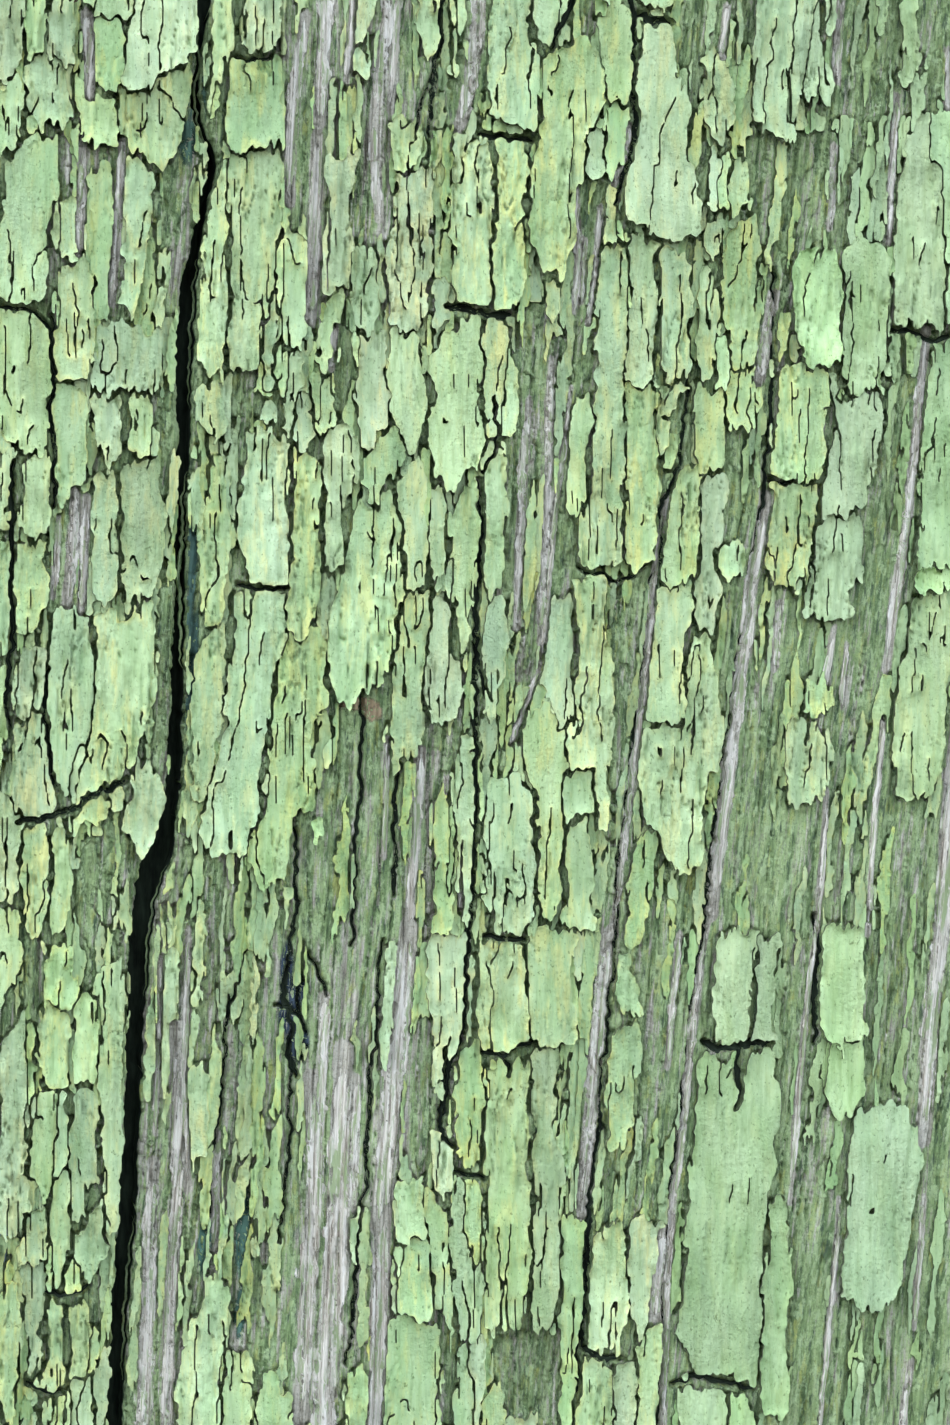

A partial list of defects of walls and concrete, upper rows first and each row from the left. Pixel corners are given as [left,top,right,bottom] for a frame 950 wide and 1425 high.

crack [26,1381,61,1395]
peeling [0,0,199,1425]
crack [45,0,270,1425]
peeling [125,942,233,1425]
peeling [143,0,901,1425]
crack [666,634,770,1239]
crack [747,271,791,576]
peeling [789,332,950,1425]
peeling [886,0,950,338]